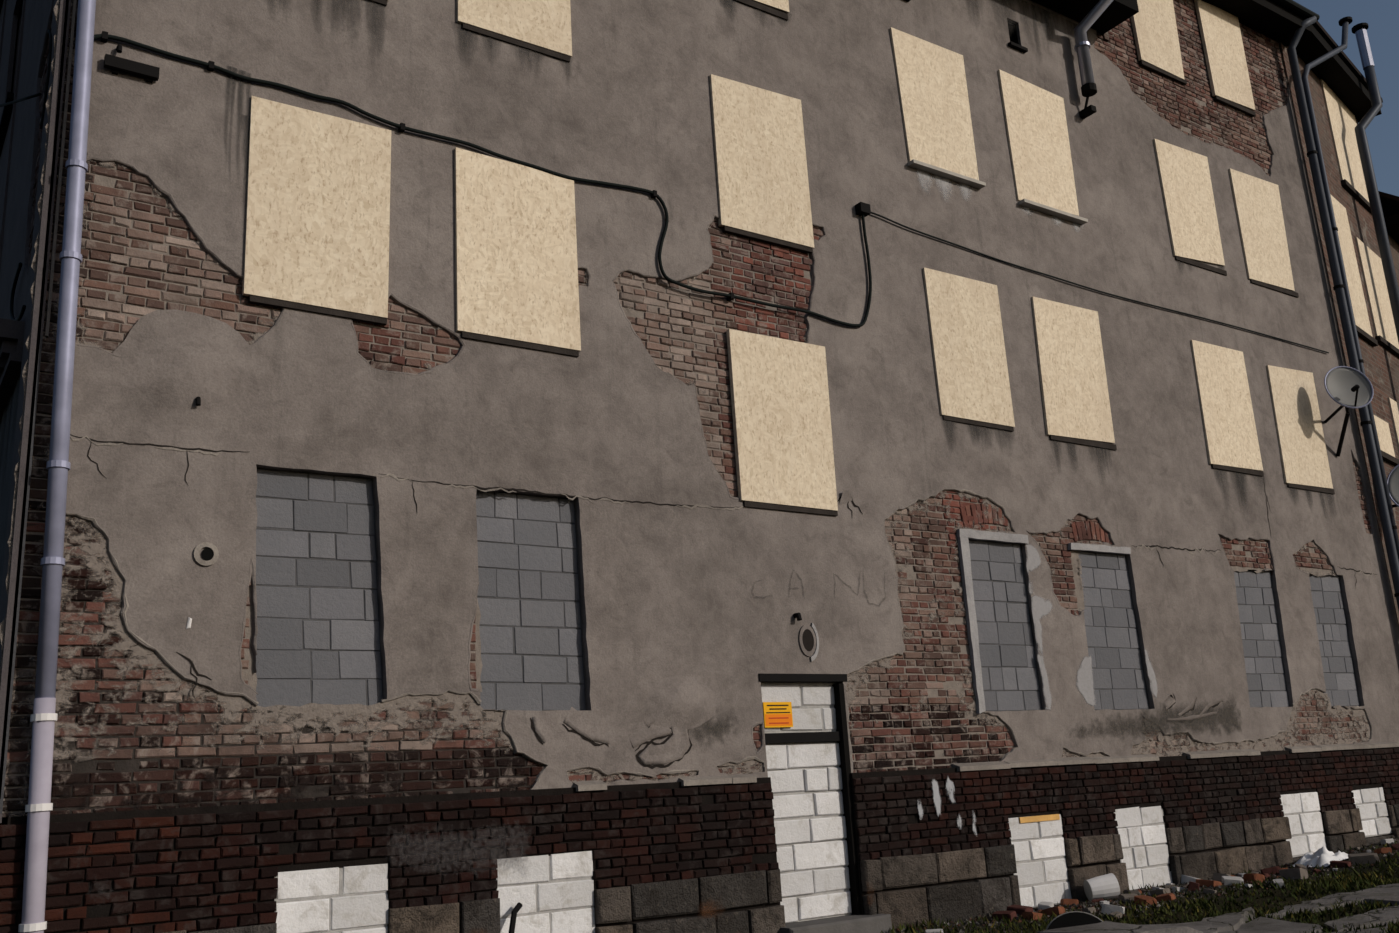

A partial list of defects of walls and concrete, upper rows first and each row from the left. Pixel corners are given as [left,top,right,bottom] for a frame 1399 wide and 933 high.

spalling [1094,0,1290,177]
spalling [0,0,78,817]
crack [70,434,244,486]
spalling [75,150,284,357]
spalling [351,292,466,376]
spalling [578,266,591,287]
spalling [612,214,827,500]
spalling [50,513,548,815]
spalling [845,489,1115,773]
spalling [1218,533,1275,576]
spalling [1131,688,1373,757]
spalling [1293,539,1338,577]